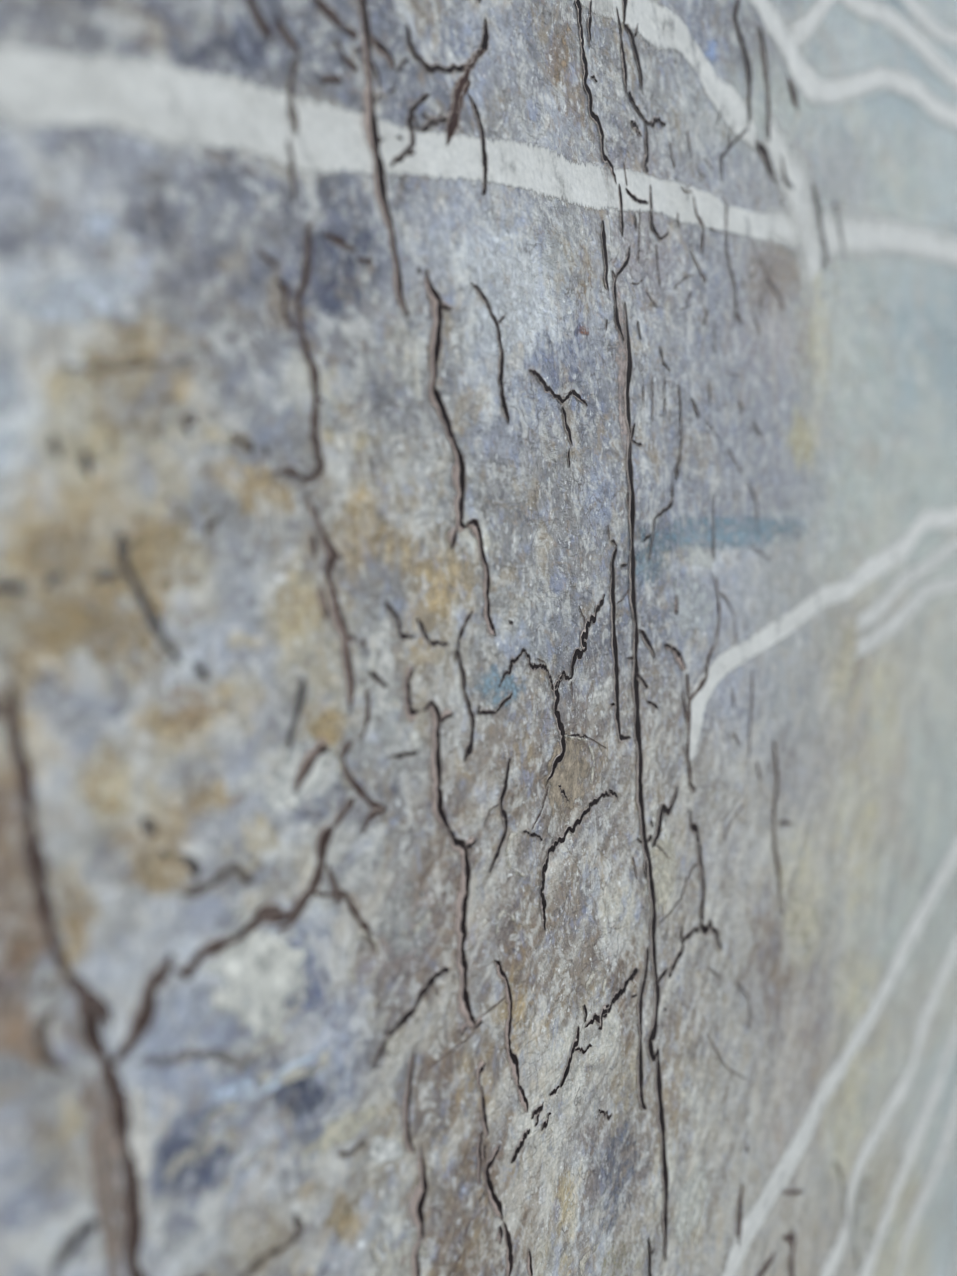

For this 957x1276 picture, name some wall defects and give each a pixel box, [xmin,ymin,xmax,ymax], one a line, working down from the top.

crack [687,0,794,190]
crack [788,77,799,109]
crack [812,183,845,272]
crack [0,0,762,1276]
crack [732,669,792,915]
crack [783,1189,803,1197]
crack [758,1226,796,1276]